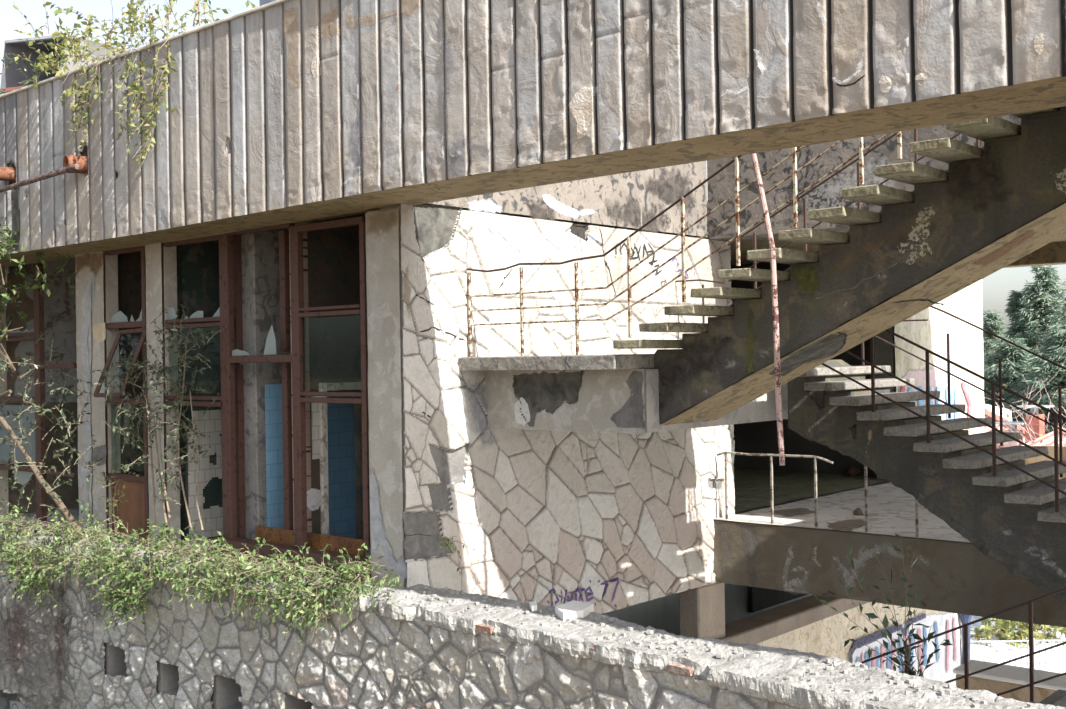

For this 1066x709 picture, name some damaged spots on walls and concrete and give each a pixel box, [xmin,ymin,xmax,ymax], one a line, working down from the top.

spalling [512,371,584,427]
spalling [610,371,645,430]
damp [0,587,68,709]